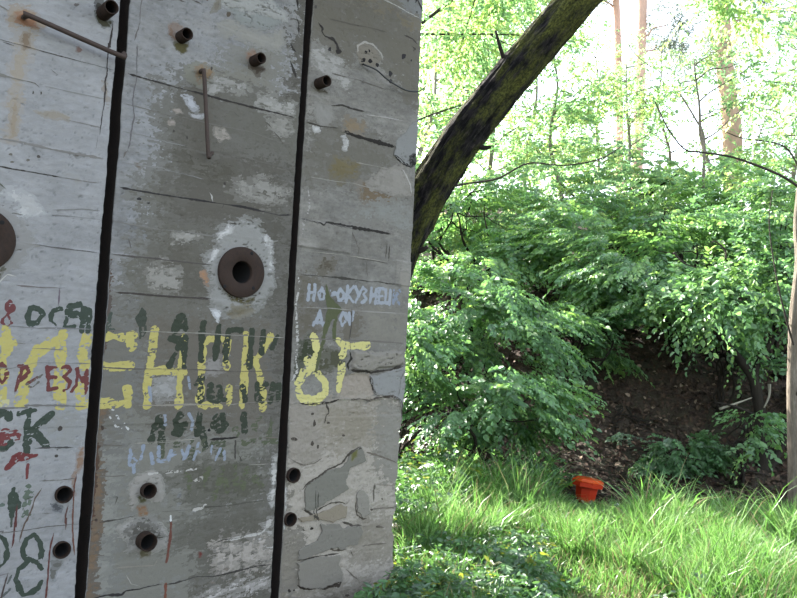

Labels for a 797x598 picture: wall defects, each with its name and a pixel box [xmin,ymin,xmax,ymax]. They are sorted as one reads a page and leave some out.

crack [96,25,113,147]
crack [123,0,142,158]
crack [290,0,300,77]
crack [319,24,339,52]
spalling [279,372,402,598]